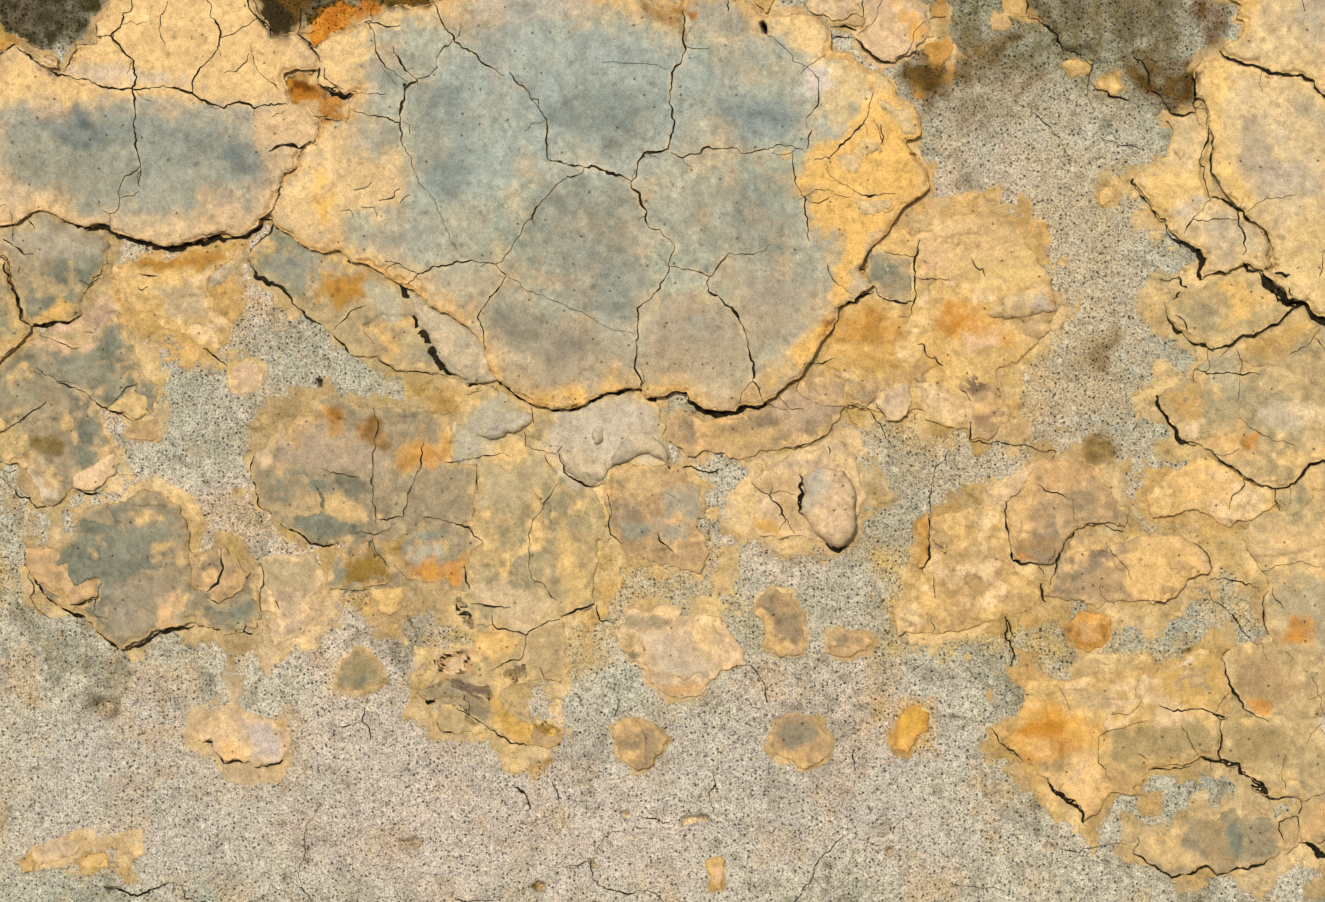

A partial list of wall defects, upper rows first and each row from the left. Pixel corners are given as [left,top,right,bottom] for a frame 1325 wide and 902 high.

flaking render [806,0,953,74]
leakage [1283,0,1325,50]
crack [0,0,1169,634]
crack [1026,0,1325,511]
flaking render [1133,112,1272,279]
crack [322,409,622,681]
flaking render [0,207,1058,754]
flaking render [893,450,1212,653]
flaking render [1146,457,1277,527]
flaking render [198,701,291,767]
crack [992,728,1139,853]
crack [1098,543,1325,859]